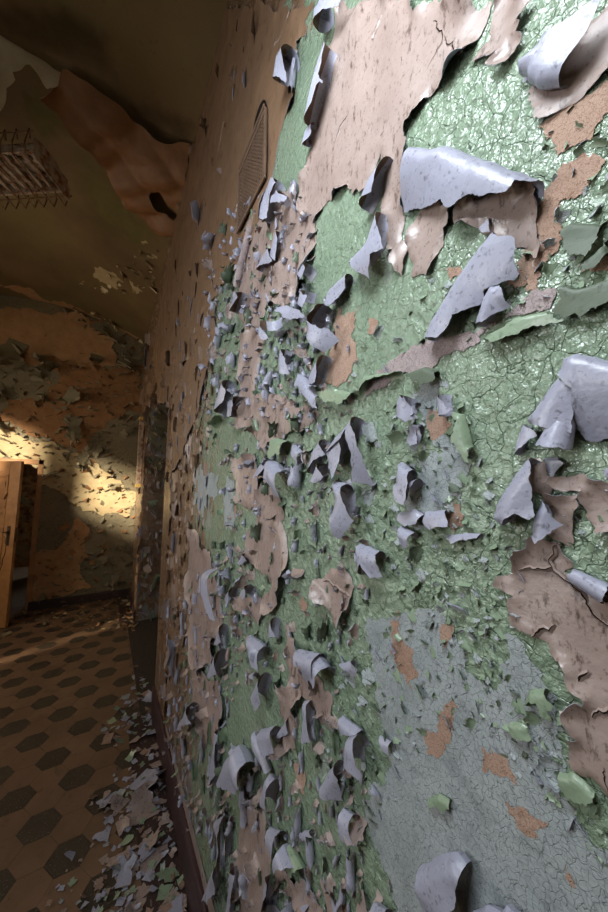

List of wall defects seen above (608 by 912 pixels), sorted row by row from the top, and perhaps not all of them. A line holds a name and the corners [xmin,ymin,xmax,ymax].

peeling [93,249,158,295]
flaking render [368,317,384,339]
peeling [482,280,608,344]
peeling [515,354,608,455]
peeling [32,518,91,601]
peeling [291,529,326,557]
peeling [308,558,354,652]
crack [519,542,608,627]
crack [531,623,557,639]
crack [577,669,591,682]
crack [591,707,608,719]
crack [600,768,608,792]